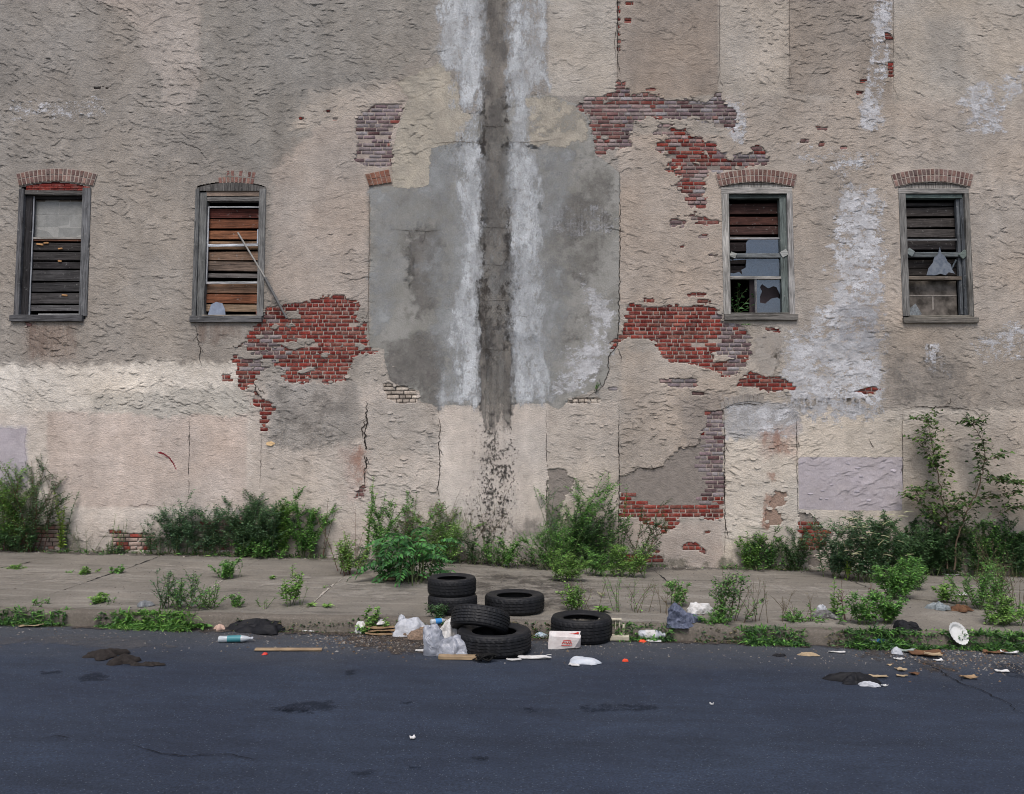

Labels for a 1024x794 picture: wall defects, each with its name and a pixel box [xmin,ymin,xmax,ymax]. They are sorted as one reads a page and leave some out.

spalling [617,2,633,53]
spalling [353,104,404,168]
spalling [576,80,770,239]
spalling [222,295,378,446]
water stain [386,0,621,609]
spalling [609,292,796,396]
water stain [725,146,889,438]
crack [361,405,369,484]
spalling [617,410,736,554]
spalling [109,530,157,551]
water stain [259,575,410,600]